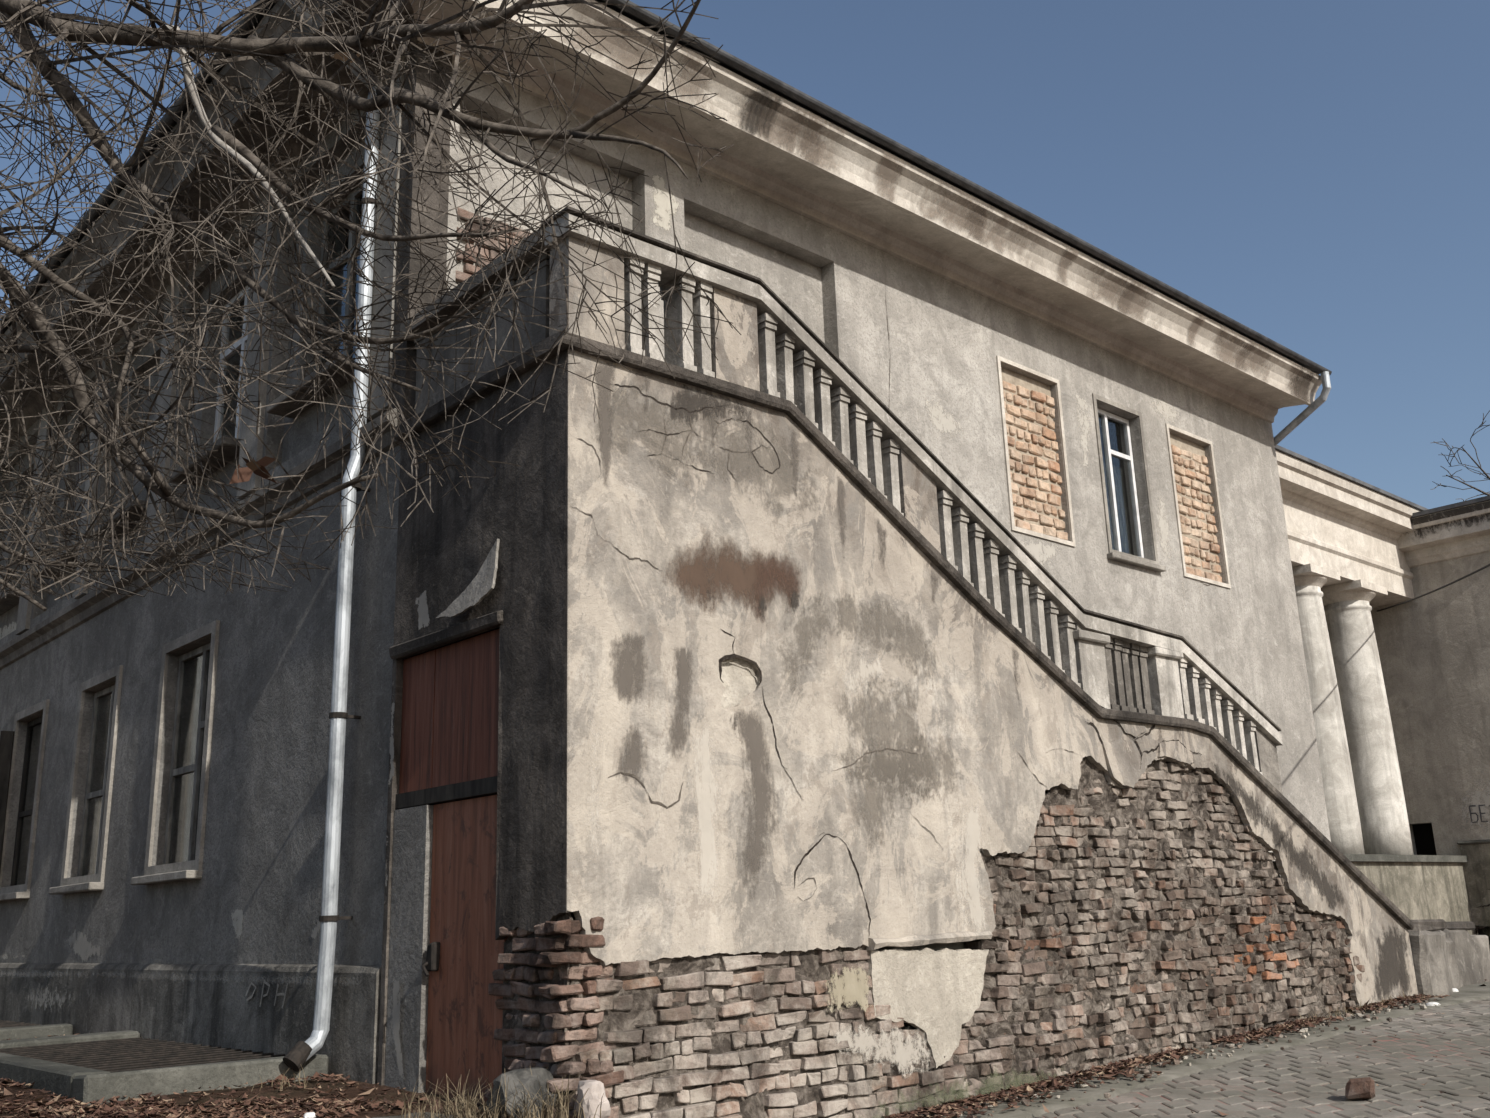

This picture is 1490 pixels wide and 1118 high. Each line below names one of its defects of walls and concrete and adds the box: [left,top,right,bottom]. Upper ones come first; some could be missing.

damp [571,20,662,75]
damp [742,87,836,168]
damp [921,189,1029,253]
flaking render [416,539,500,629]
damp [613,636,645,700]
damp [587,648,718,896]
spalling [718,629,762,708]
damp [734,711,778,881]
crack [762,687,803,800]
damp [786,595,954,843]
crack [794,832,871,935]
spalling [488,720,1365,1118]